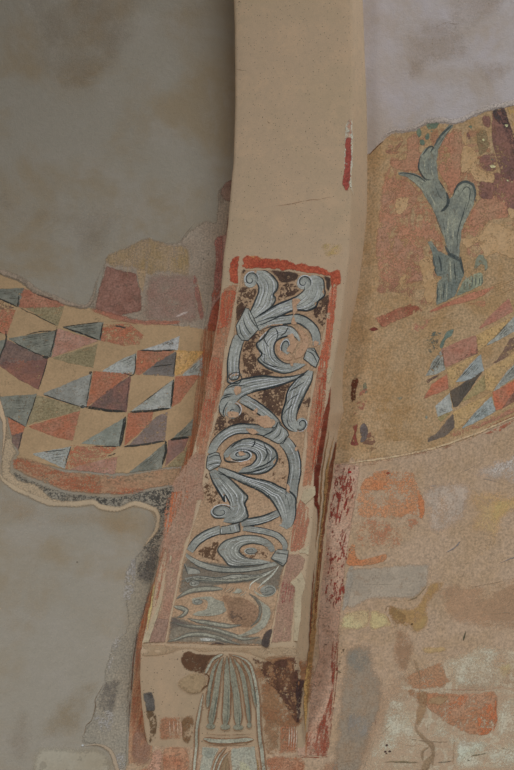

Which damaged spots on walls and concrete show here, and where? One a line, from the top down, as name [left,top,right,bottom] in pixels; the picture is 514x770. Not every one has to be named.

flaking render [1,414,92,502]
flaking render [83,503,171,770]